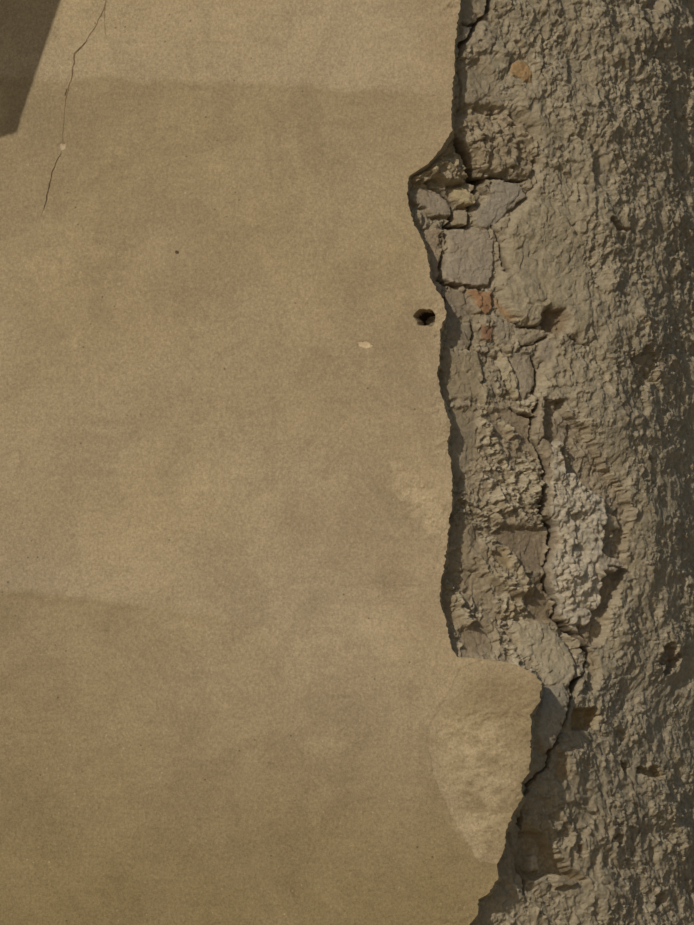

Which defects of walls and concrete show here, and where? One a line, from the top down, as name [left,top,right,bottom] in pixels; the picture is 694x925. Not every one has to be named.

crack [41,2,106,215]
crack [436,0,529,301]
crack [466,322,474,349]
spalling [407,0,635,753]
crack [508,320,592,830]
spalling [513,829,582,889]